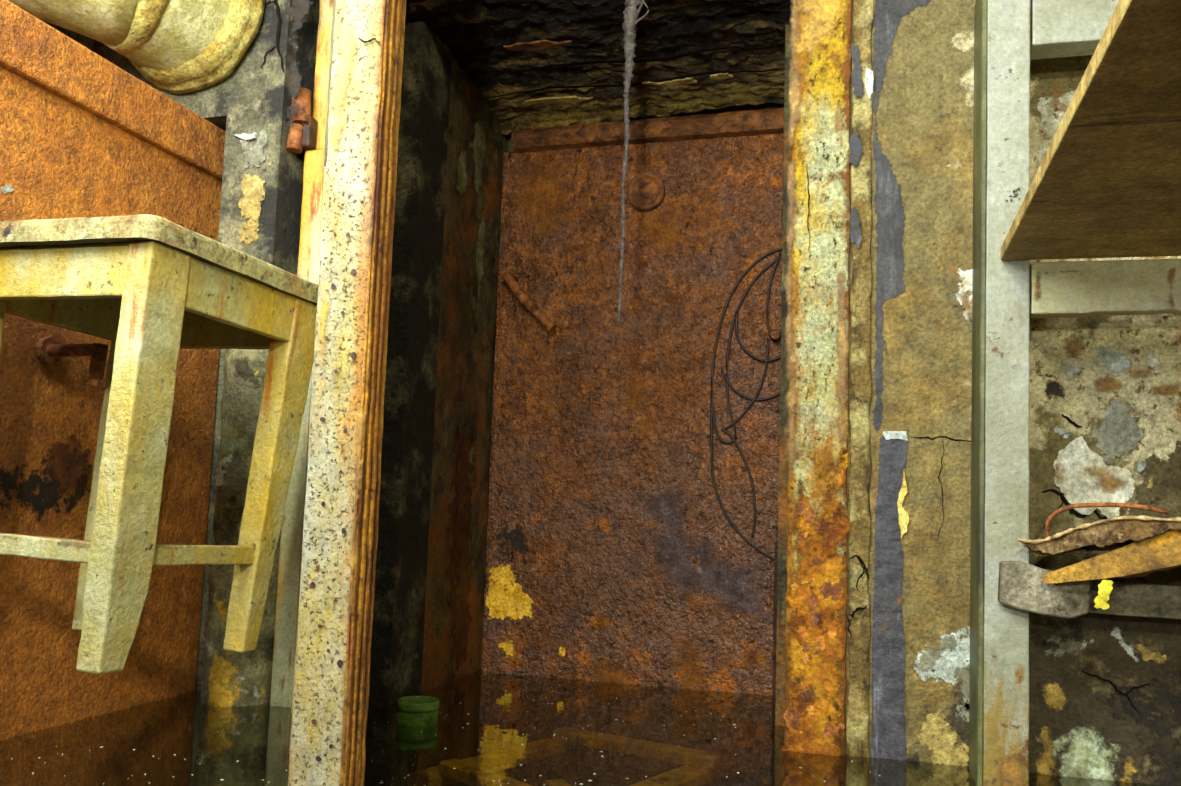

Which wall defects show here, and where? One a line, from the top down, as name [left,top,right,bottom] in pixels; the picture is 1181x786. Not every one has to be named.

crack [260,0,284,72]
corrosion [789,0,801,140]
peeling [848,0,972,786]
flaking render [1095,345,1162,378]
corrosion [0,435,92,521]
corrosion [780,162,850,786]
crack [908,434,971,541]
peeling [1053,399,1181,519]
crack [1082,670,1149,714]